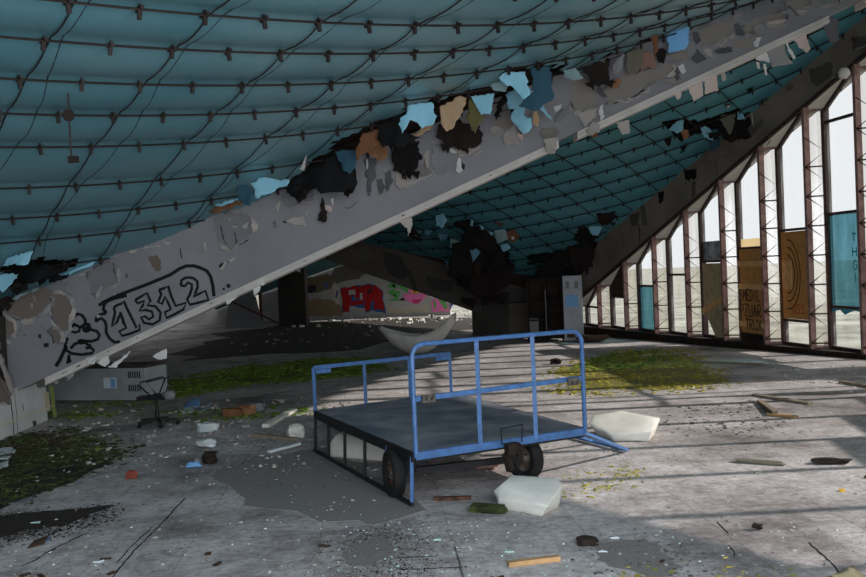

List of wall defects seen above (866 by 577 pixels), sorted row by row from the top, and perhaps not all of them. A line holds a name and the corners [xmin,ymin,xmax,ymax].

spalling [540,0,811,154]
spalling [489,108,523,140]
peeling [364,150,432,196]
peeling [450,145,482,174]
spalling [273,187,334,226]
spalling [79,257,121,298]
peeling [76,351,130,368]
crack [112,498,185,577]